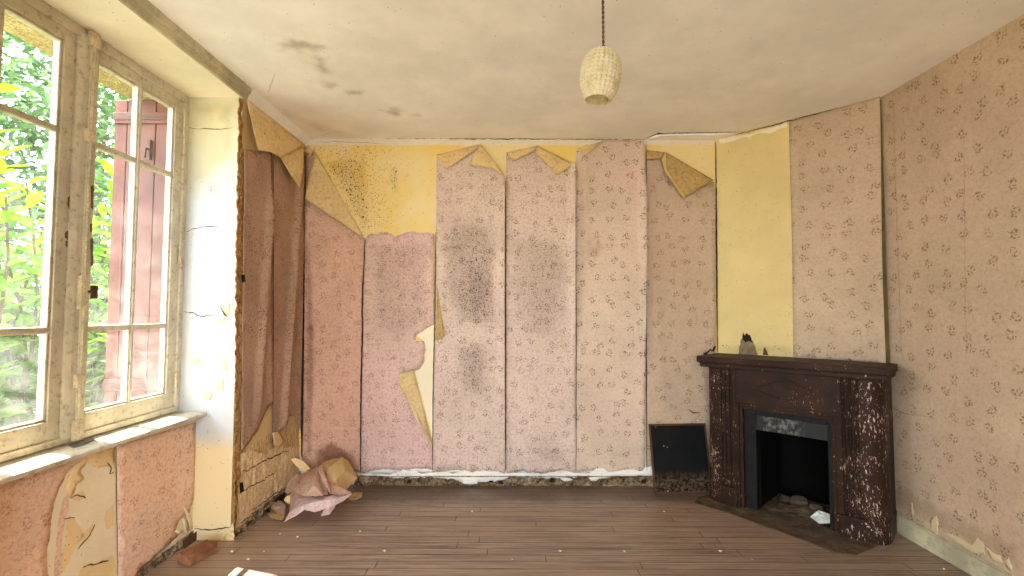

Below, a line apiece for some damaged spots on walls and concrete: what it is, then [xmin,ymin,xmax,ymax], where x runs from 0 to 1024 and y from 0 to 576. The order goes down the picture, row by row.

flaking render [719,123,787,144]
spalling [204,97,301,541]
water stain [440,221,501,323]
flaking render [930,516,1013,572]